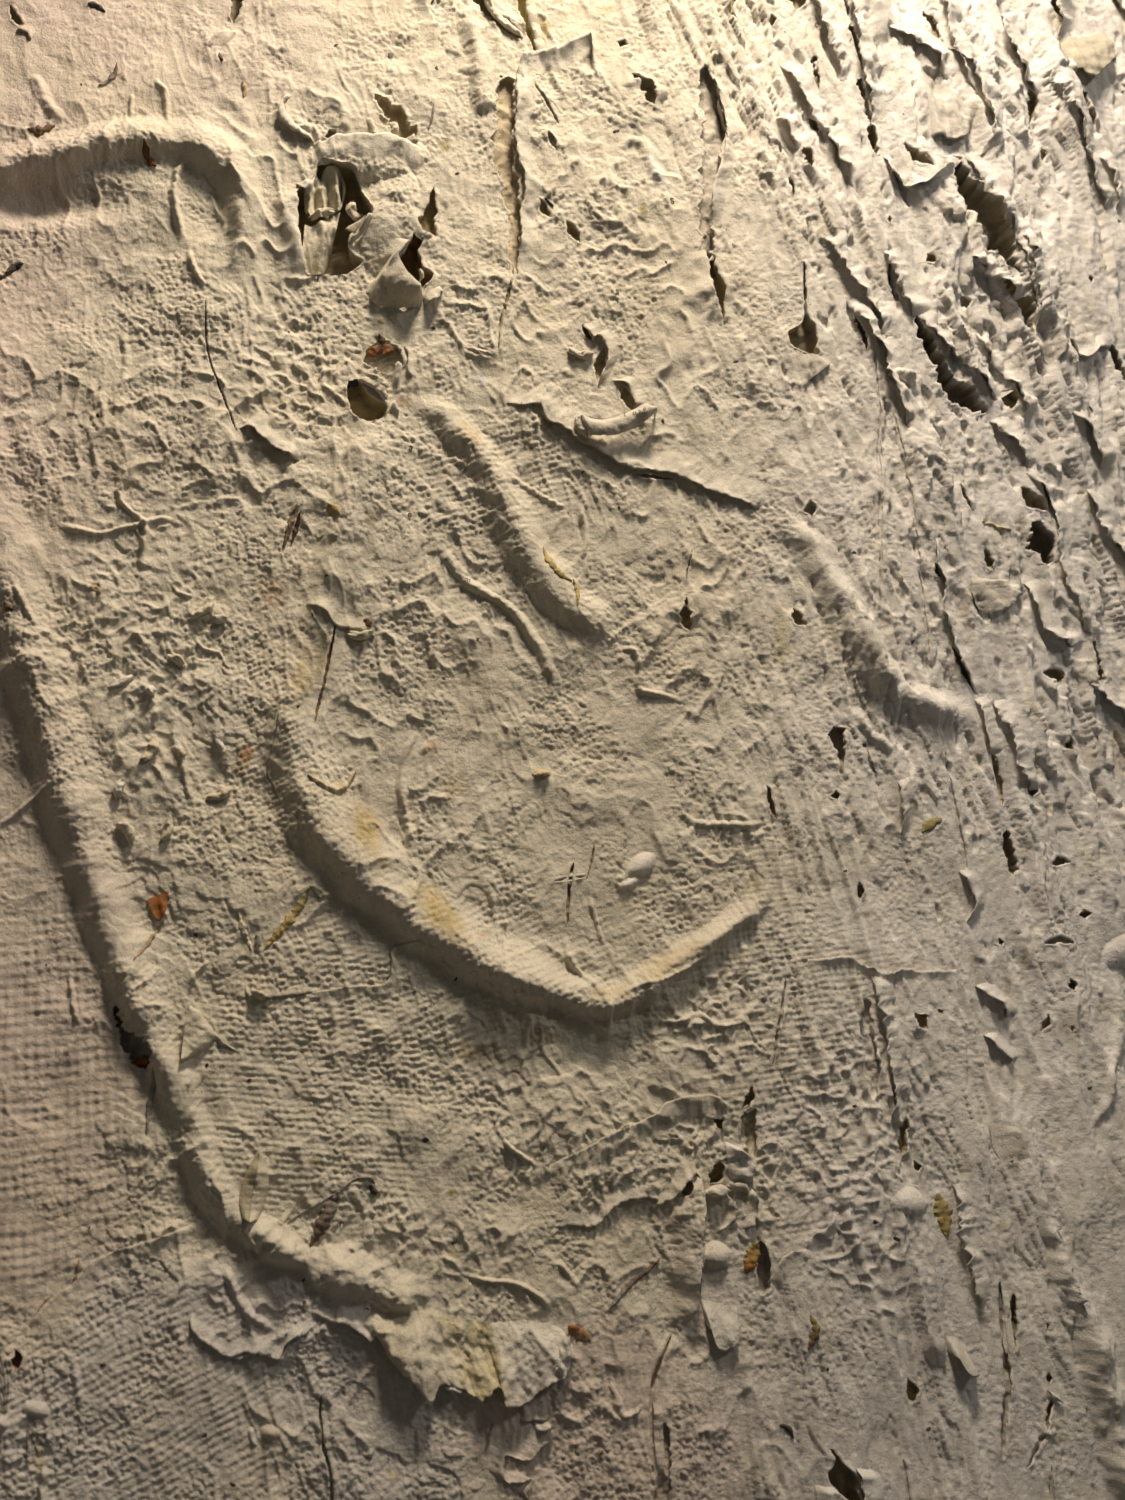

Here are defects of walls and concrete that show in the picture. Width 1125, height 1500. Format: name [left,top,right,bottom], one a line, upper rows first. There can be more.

spalling [278,91,442,309]
peeling [507,321,774,510]
peeling [776,60,873,190]
peeling [824,227,934,428]
peeling [816,0,1005,188]
peeling [975,328,1045,468]
peeling [975,168,1125,393]
peeling [996,0,1125,224]
peeling [930,534,1088,798]
peeling [808,955,1029,1123]
peeling [189,1311,313,1361]
peeling [333,1298,573,1500]